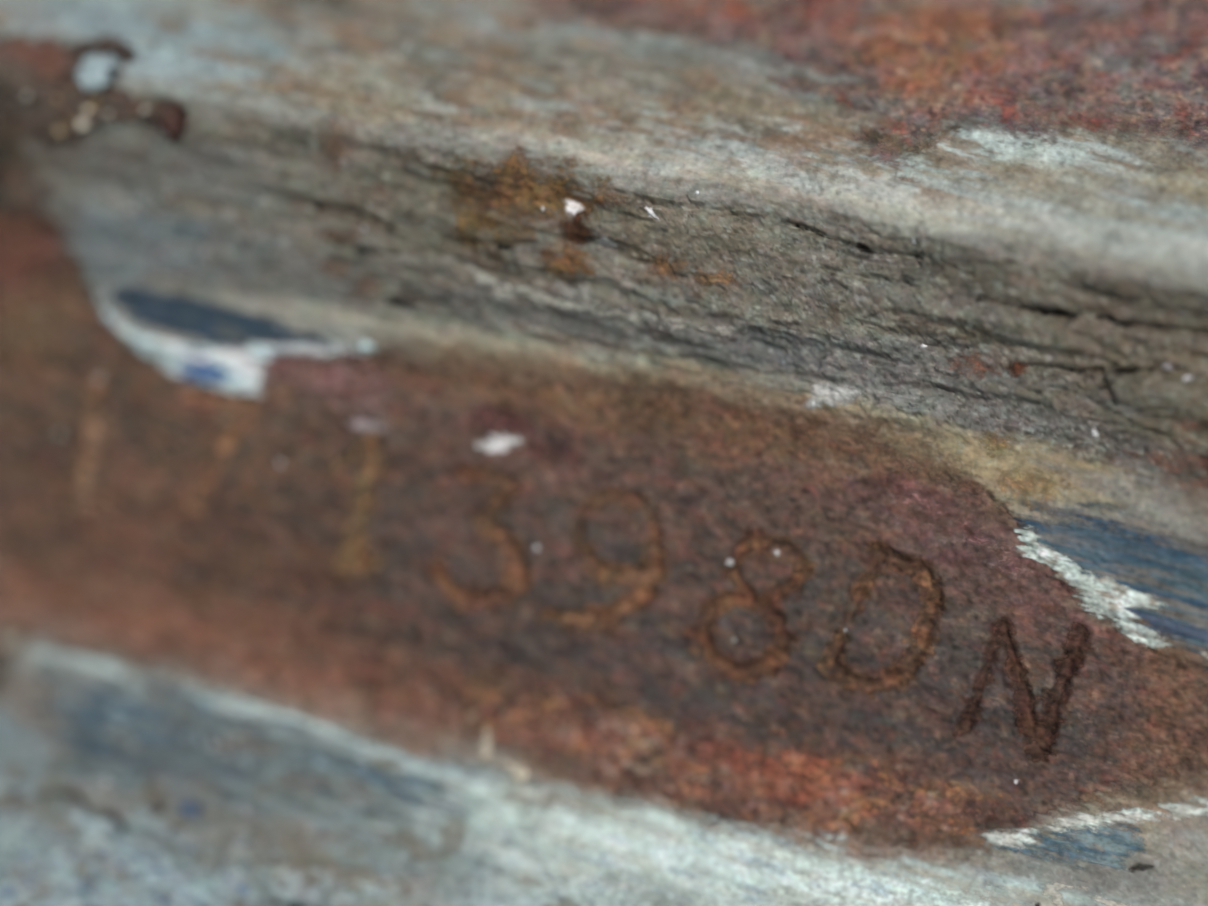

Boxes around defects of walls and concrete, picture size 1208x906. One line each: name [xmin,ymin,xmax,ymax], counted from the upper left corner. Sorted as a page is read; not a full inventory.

rust [534,0,1208,163]
peeling [97,286,374,396]
rust [0,206,1208,858]
peeling [1014,501,1208,663]